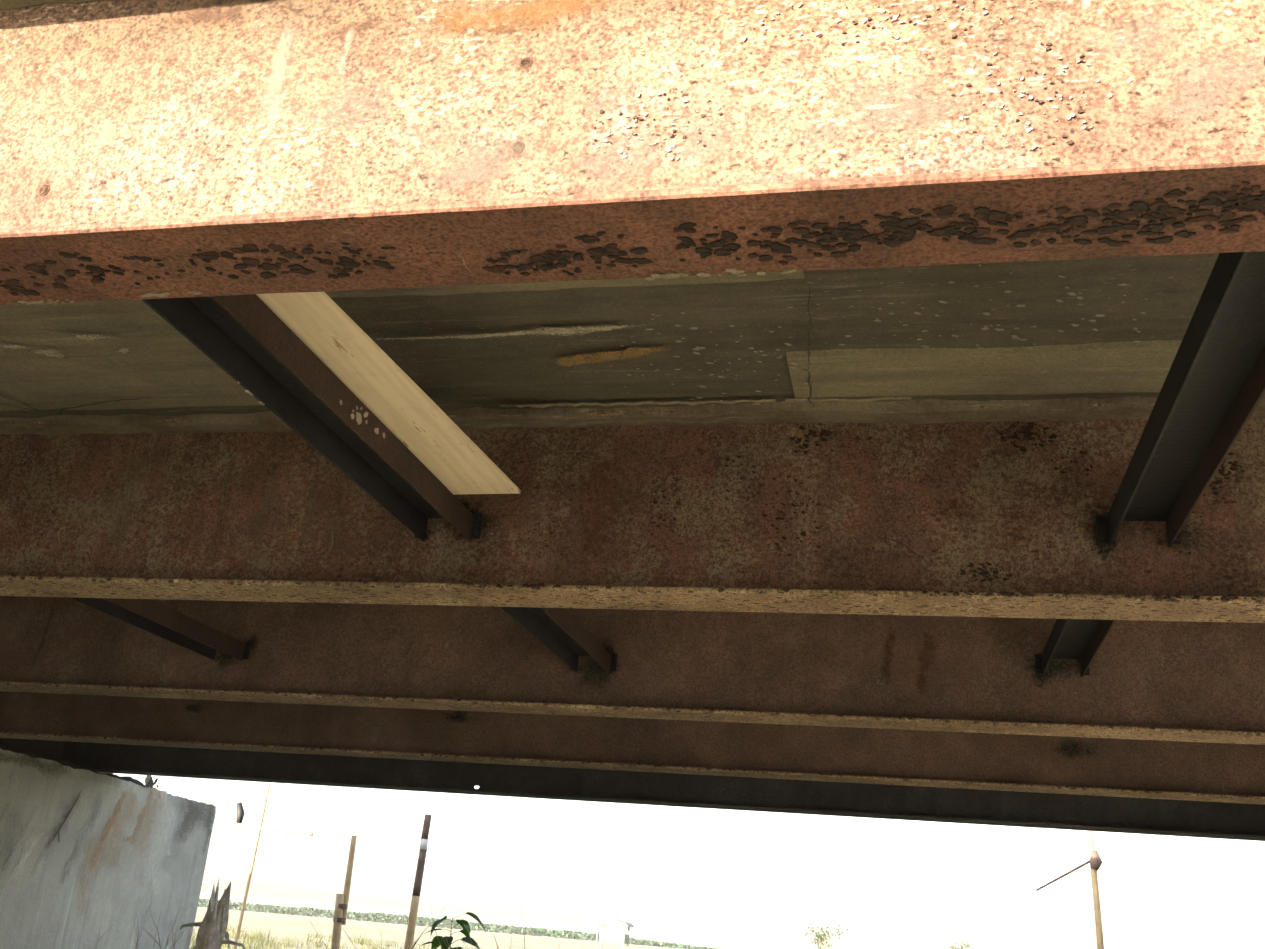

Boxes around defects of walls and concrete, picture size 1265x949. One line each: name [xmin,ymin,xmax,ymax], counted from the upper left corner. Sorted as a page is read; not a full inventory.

damp [144,796,215,899]